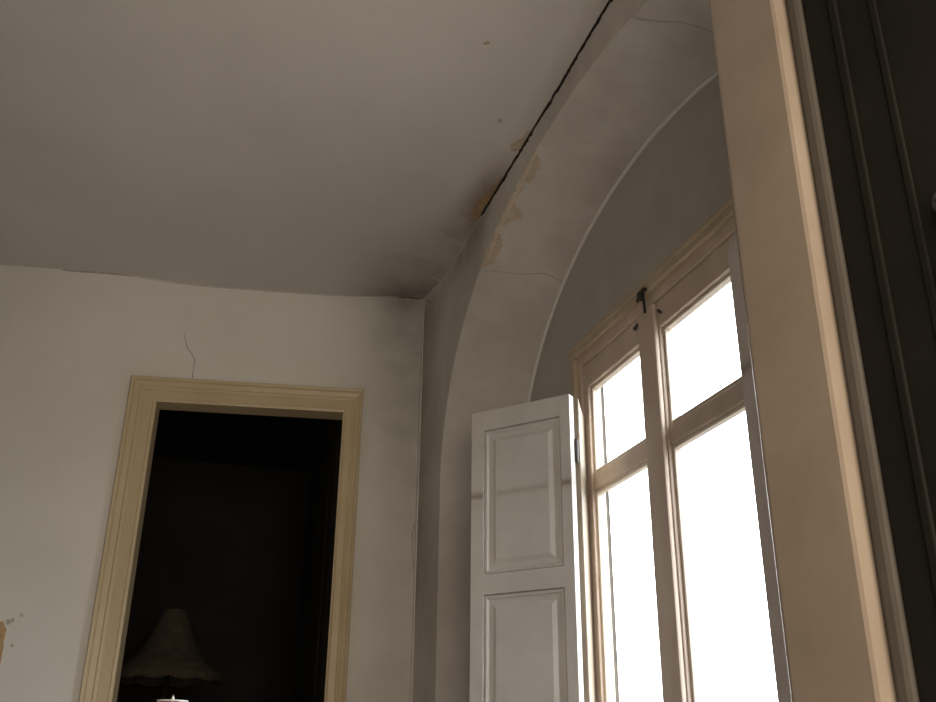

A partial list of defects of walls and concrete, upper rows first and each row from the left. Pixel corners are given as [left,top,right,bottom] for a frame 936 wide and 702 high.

crack [467,0,613,239]
flaking render [481,150,542,268]
peeling [0,613,23,663]